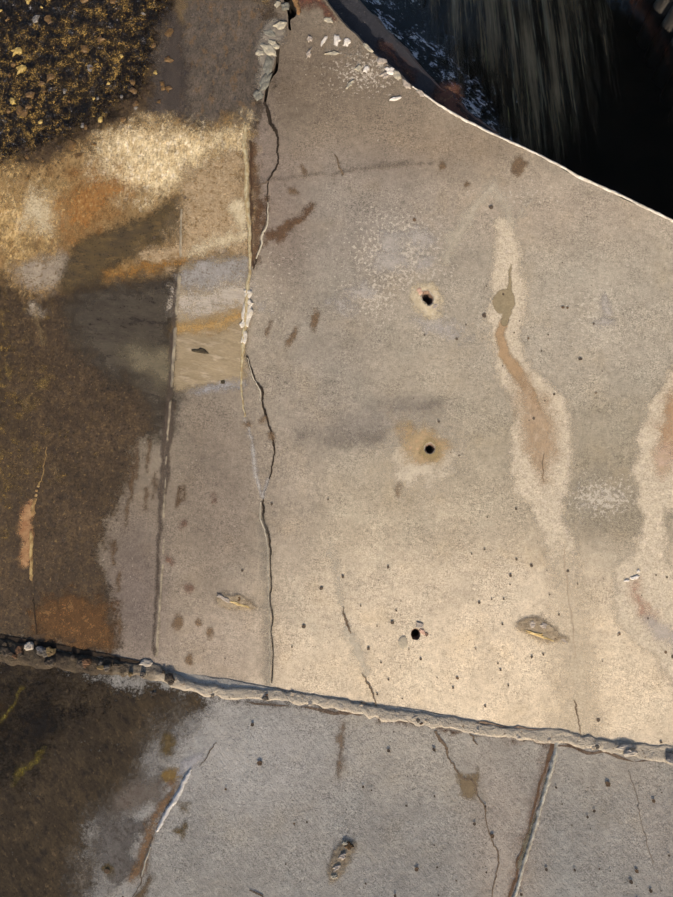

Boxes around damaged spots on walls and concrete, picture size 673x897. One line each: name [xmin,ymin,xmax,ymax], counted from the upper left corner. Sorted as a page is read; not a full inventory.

peeling [253,1,290,101]
crack [253,0,301,270]
water stain [0,0,281,657]
crack [244,356,275,683]
water stain [0,662,220,897]
water stain [232,688,345,713]
crack [434,731,500,897]